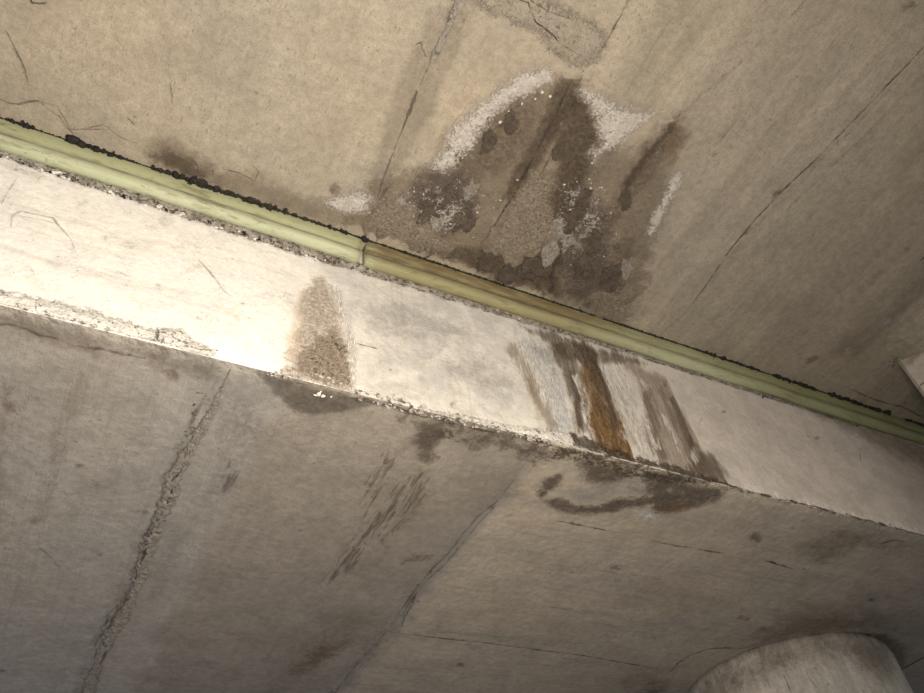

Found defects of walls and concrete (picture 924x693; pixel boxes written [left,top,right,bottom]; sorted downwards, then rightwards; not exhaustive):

crack [416,0,460,71]
crack [378,91,418,200]
water stain [309,66,689,323]
crack [701,162,813,291]
water stain [413,329,729,520]
rust [569,353,635,462]
crack [82,369,231,693]
water stain [323,472,428,584]